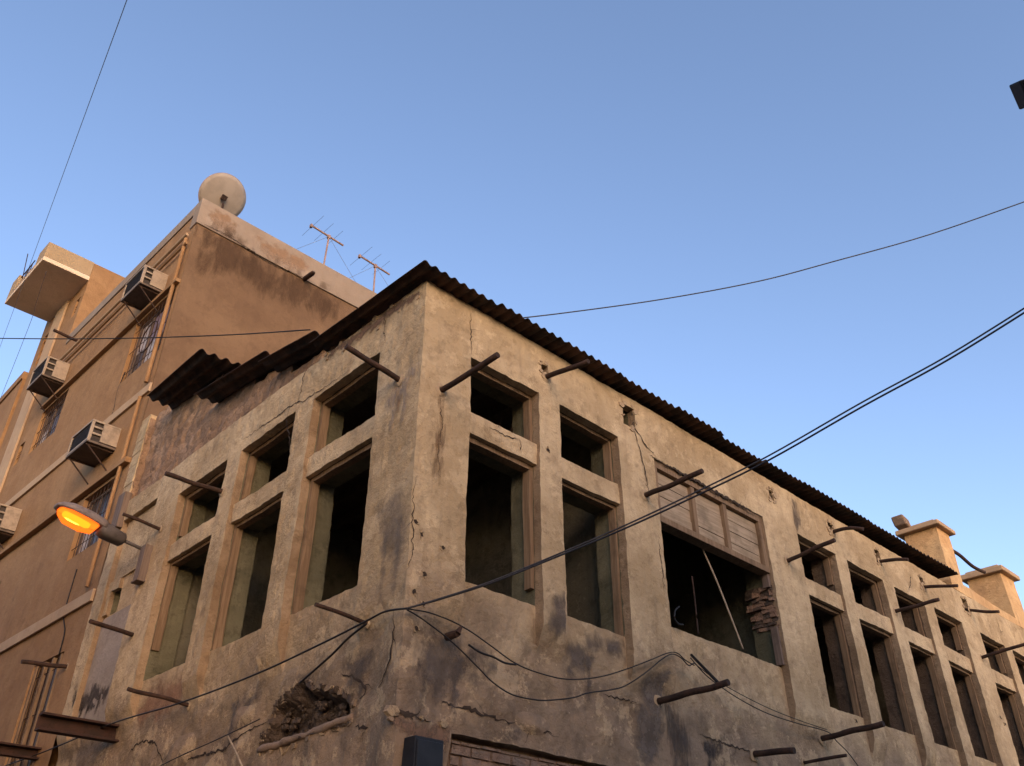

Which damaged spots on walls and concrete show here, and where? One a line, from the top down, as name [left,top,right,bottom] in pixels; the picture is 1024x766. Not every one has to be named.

water stain [206,230,331,314]
crack [404,400,451,570]
crack [629,417,763,517]
spalling [745,585,780,632]
water stain [72,683,109,717]
spalling [256,679,357,756]